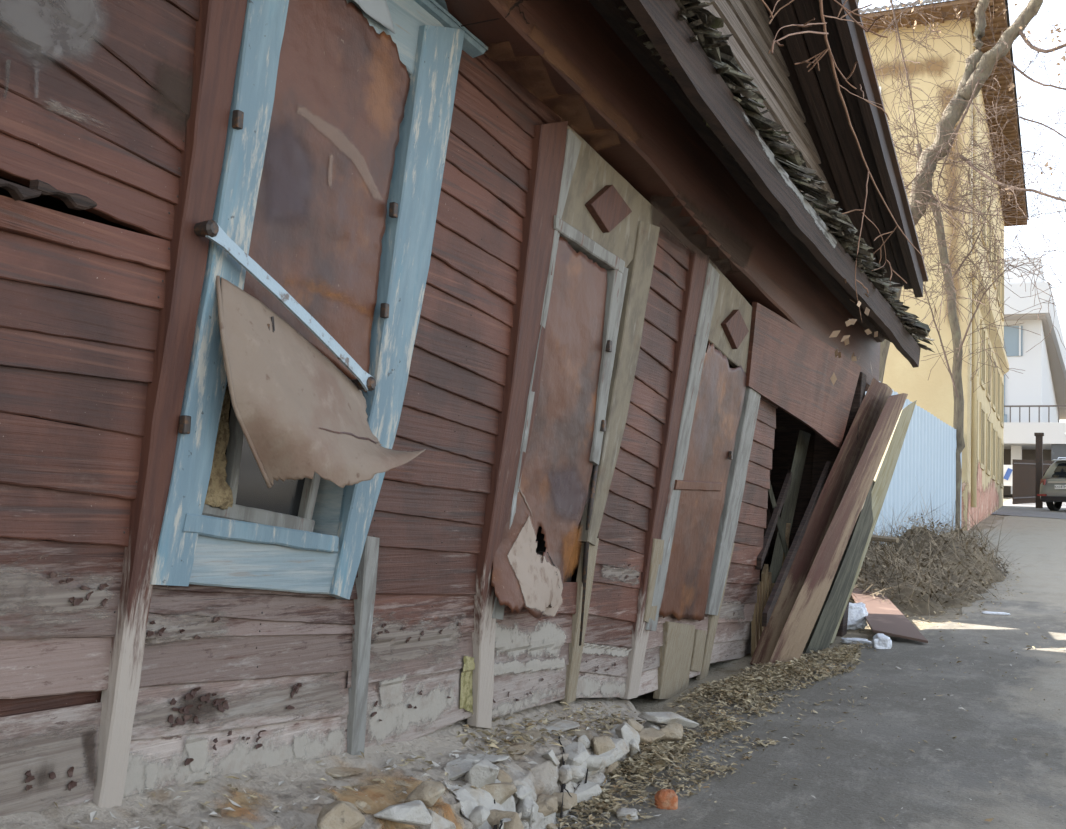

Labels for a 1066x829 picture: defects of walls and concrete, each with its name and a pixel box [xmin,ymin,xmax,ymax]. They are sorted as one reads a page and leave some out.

water stain [0,0,102,60]